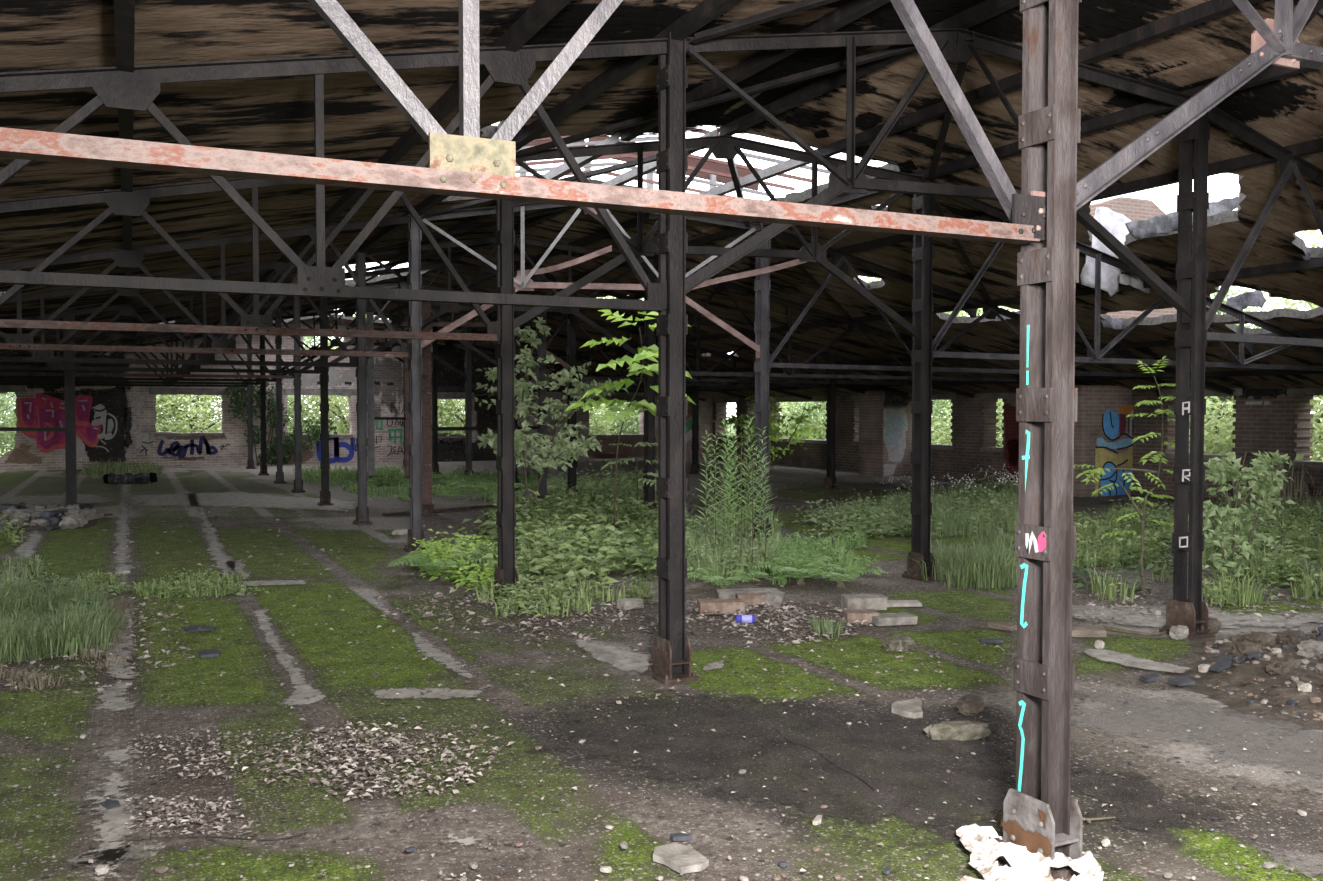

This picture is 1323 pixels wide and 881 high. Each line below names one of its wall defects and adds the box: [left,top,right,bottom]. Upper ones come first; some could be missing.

rust [1001,809,1052,871]